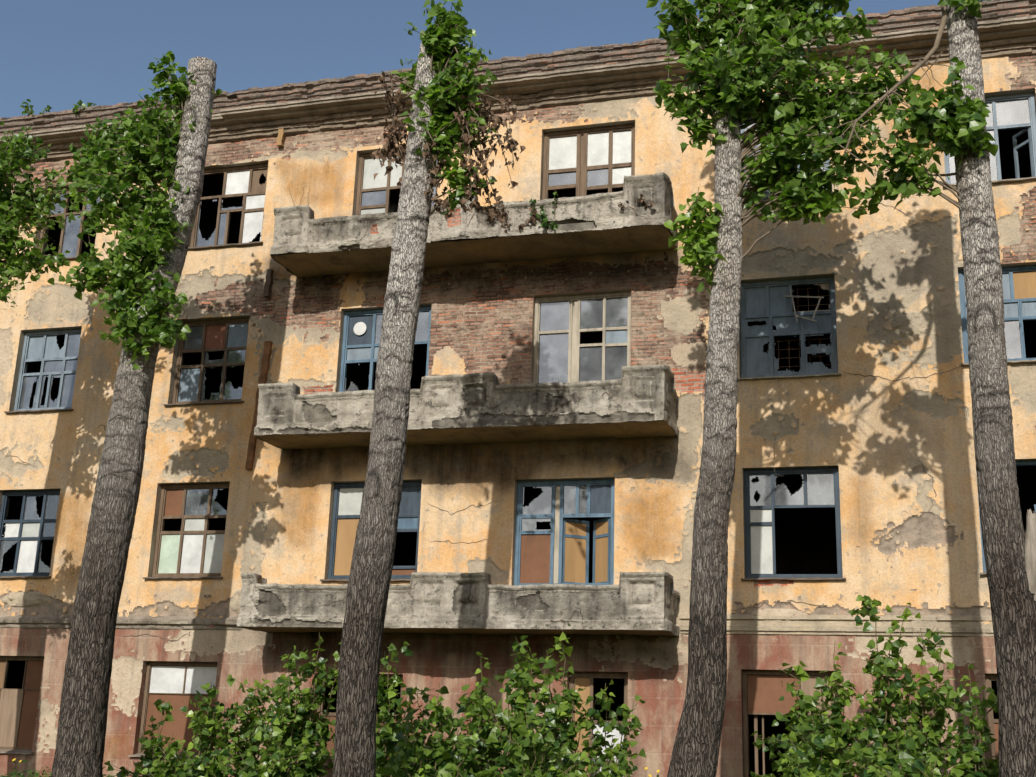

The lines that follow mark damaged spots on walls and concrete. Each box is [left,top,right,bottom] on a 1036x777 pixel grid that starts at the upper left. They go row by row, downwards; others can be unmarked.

flaking render [1000,55,1036,91]
flaking render [996,186,1036,264]
peeling [742,211,964,375]
flaking render [169,262,388,435]
peeling [0,441,47,487]
peeling [149,414,240,483]
flaking render [420,251,710,683]
peeling [745,399,805,453]
peeling [897,385,972,432]
peeling [1008,362,1036,430]
flaking render [856,463,964,568]
flaking render [0,583,73,618]